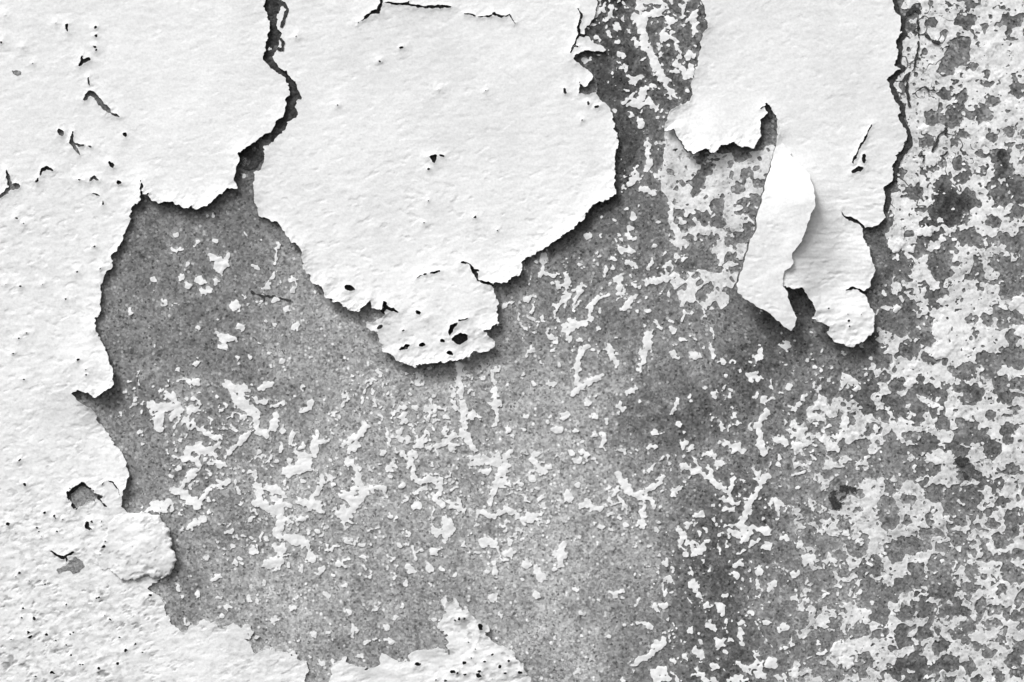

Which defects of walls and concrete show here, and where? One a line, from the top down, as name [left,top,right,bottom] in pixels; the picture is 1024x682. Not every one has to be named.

crack [358,0,515,23]
crack [238,0,302,170]
crack [883,0,950,211]
peeling [170,232,230,296]
peeling [689,327,773,390]
peeling [122,367,393,588]
peeling [652,509,710,613]
peeling [318,597,531,682]
peeling [630,617,686,673]
peeling [650,626,725,682]
peeling [684,567,773,654]
peeling [726,647,778,682]